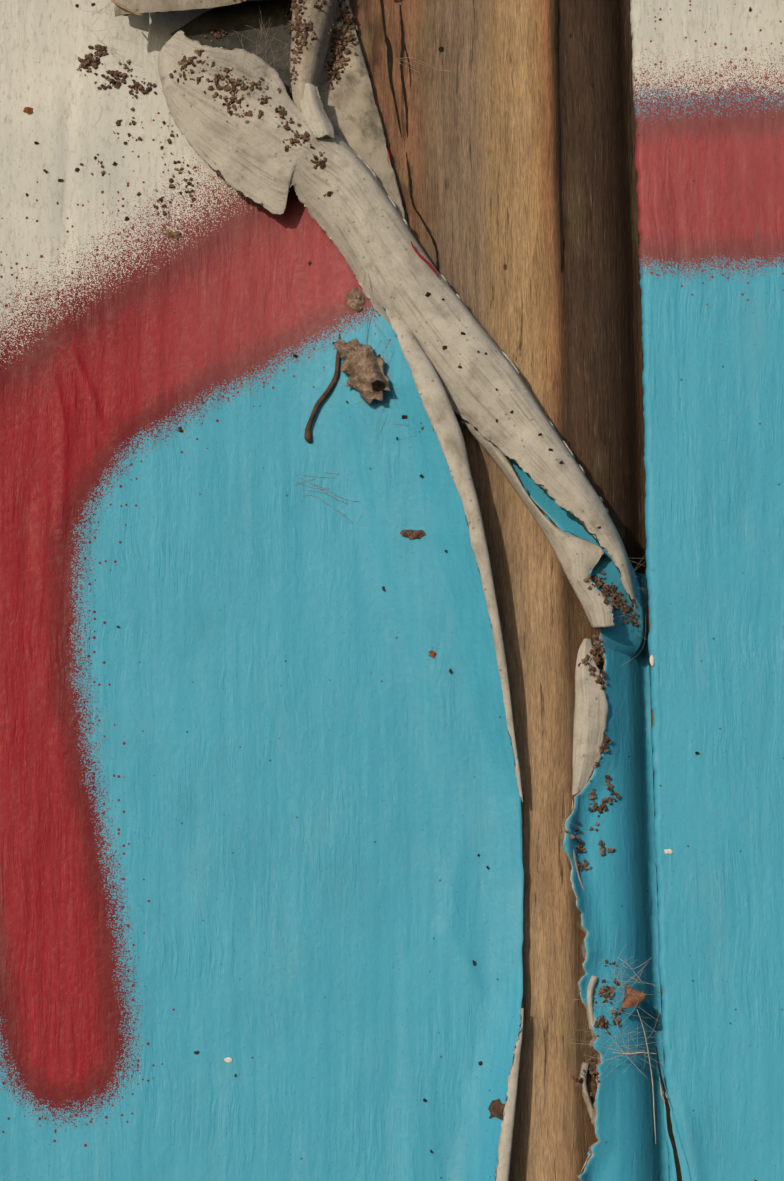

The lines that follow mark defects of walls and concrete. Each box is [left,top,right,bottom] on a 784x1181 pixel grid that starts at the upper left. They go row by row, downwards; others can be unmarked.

peeling [114,0,669,1181]
crack [380,0,439,272]